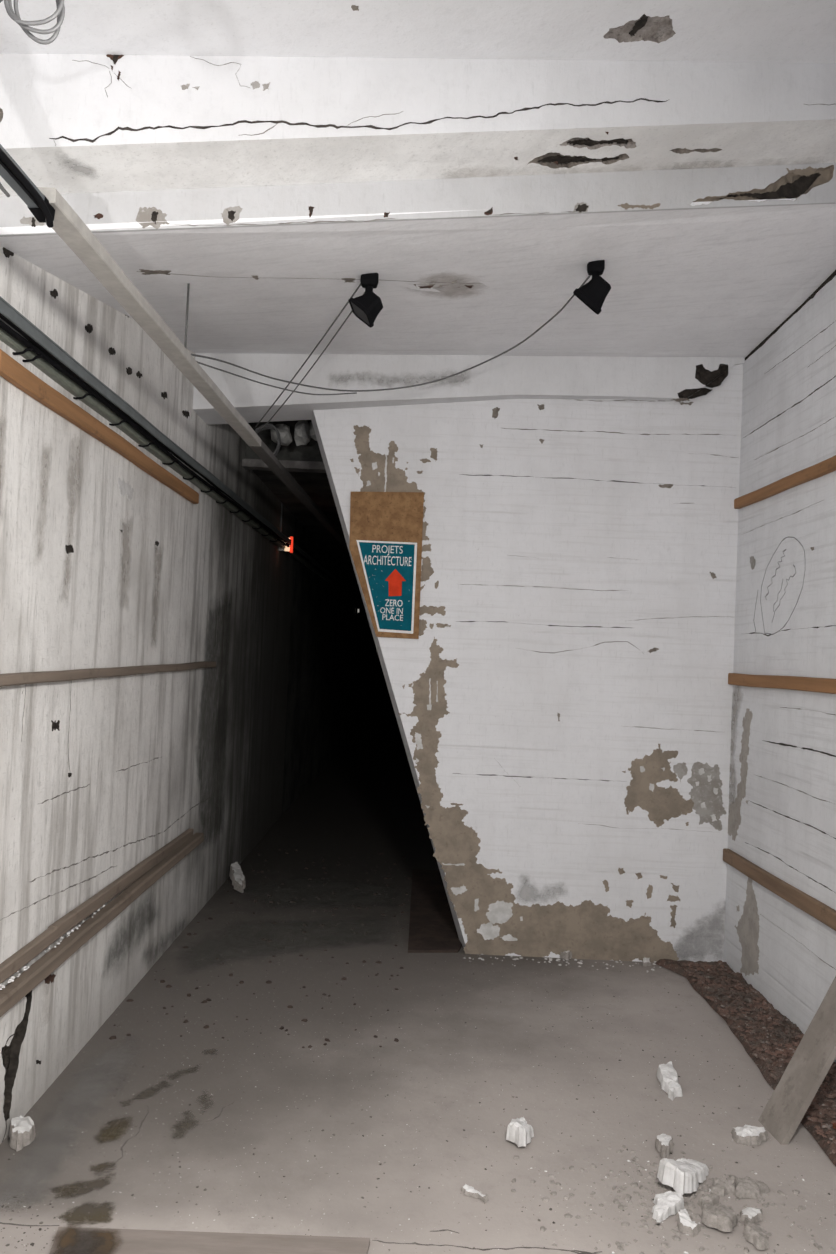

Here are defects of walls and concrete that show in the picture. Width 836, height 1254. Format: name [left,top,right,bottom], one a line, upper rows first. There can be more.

spalling [604,14,676,43]
crack [49,98,670,146]
spalling [514,132,637,169]
spalling [689,165,834,206]
peeling [350,425,680,972]
peeling [622,708,753,841]
peeling [734,877,760,976]
crack [1,991,32,1142]
damp [96,1067,198,1143]
damp [173,1095,211,1138]
damp [52,1162,115,1225]
crack [372,1229,602,1254]